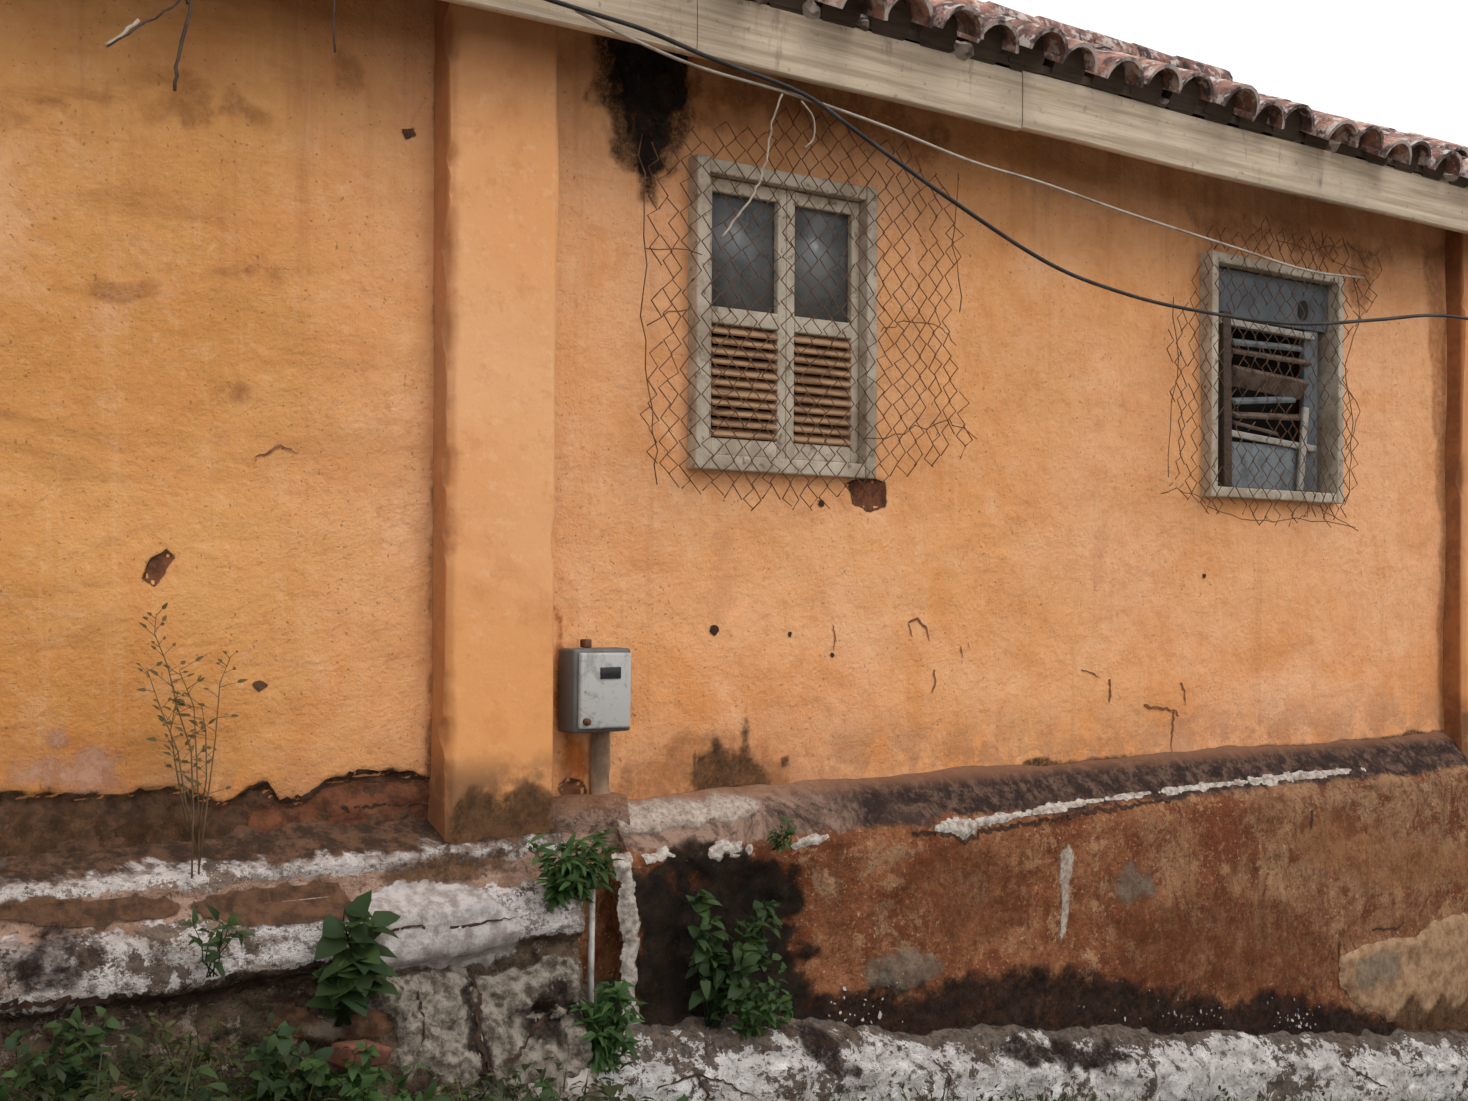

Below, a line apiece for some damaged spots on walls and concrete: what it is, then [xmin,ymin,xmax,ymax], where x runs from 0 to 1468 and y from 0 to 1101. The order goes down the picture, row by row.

damp [668,53,688,110]
flaking render [848,479,887,512]
flaking render [0,768,430,857]
damp [618,720,770,833]
damp [3,925,101,993]
crack [373,916,518,939]
crack [365,953,608,1101]
damp [795,964,1468,1036]